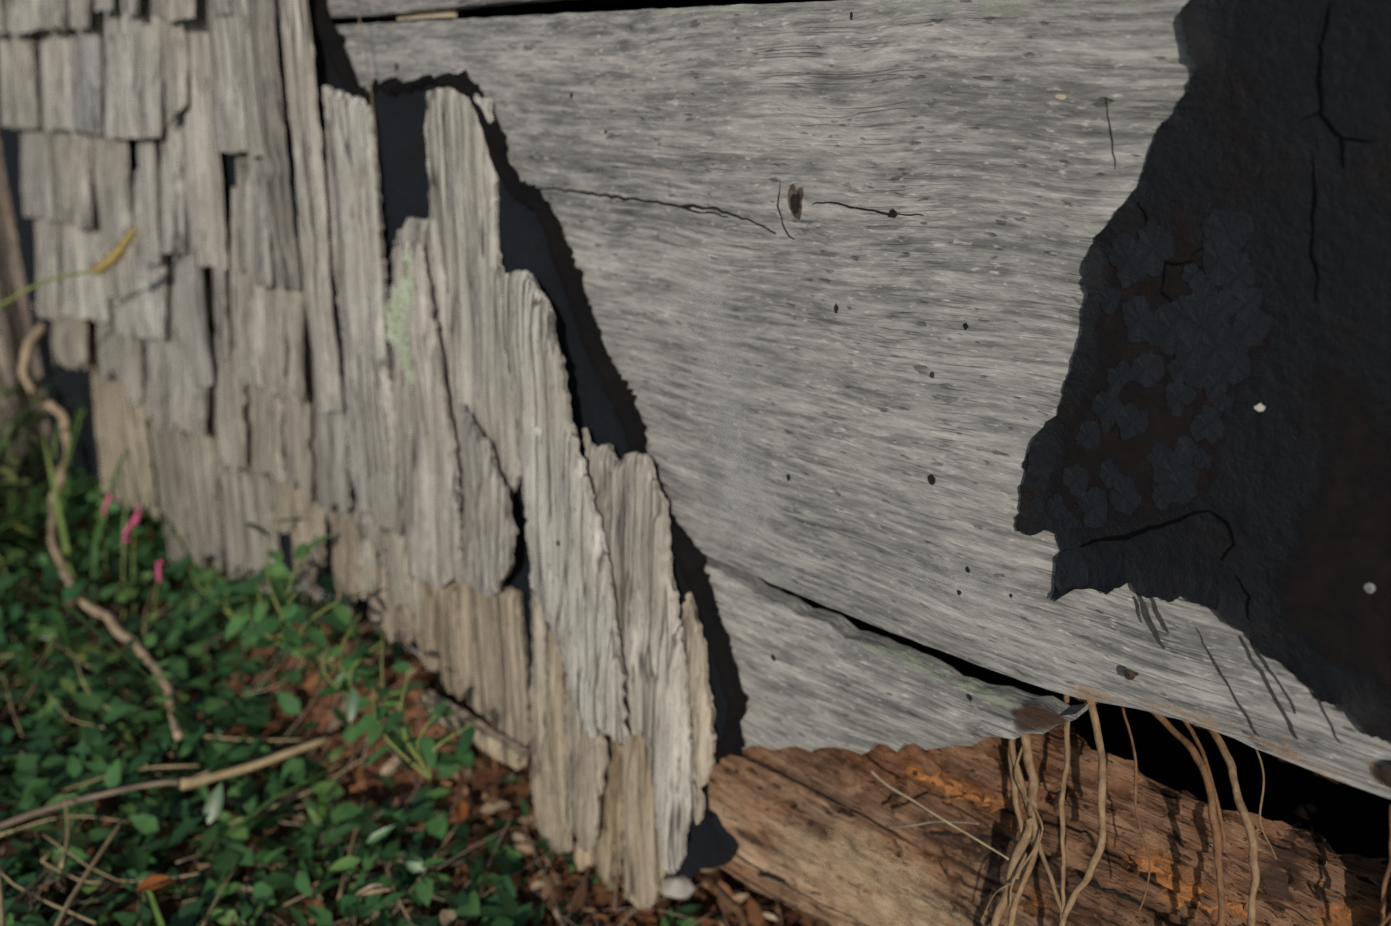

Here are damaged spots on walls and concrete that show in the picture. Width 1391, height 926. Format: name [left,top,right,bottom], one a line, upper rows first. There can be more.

crack [1301,3,1372,301]
crack [535,182,924,239]
spalling [1133,592,1170,649]
spalling [1196,628,1260,737]
spalling [1238,635,1298,740]
spalling [1312,693,1343,745]